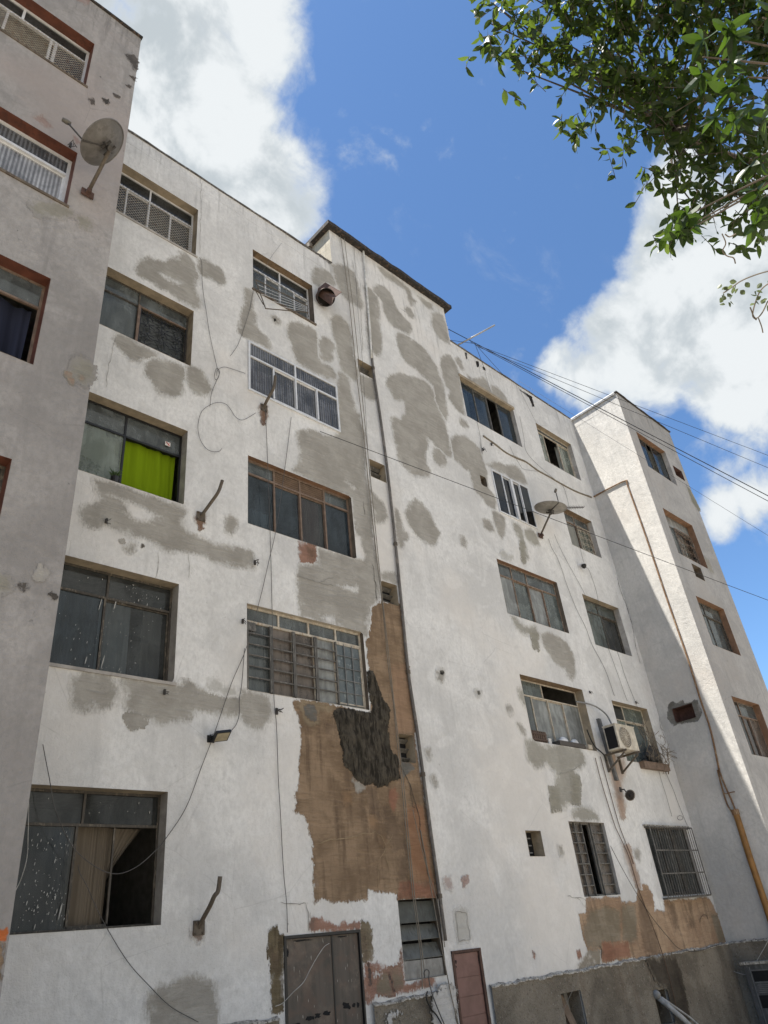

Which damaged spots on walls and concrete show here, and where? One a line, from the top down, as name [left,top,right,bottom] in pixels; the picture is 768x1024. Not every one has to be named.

peeling [296,540,317,564]
peeling [292,601,469,1006]
water stain [524,737,600,822]
peeling [576,883,726,964]
peeling [266,924,285,1017]